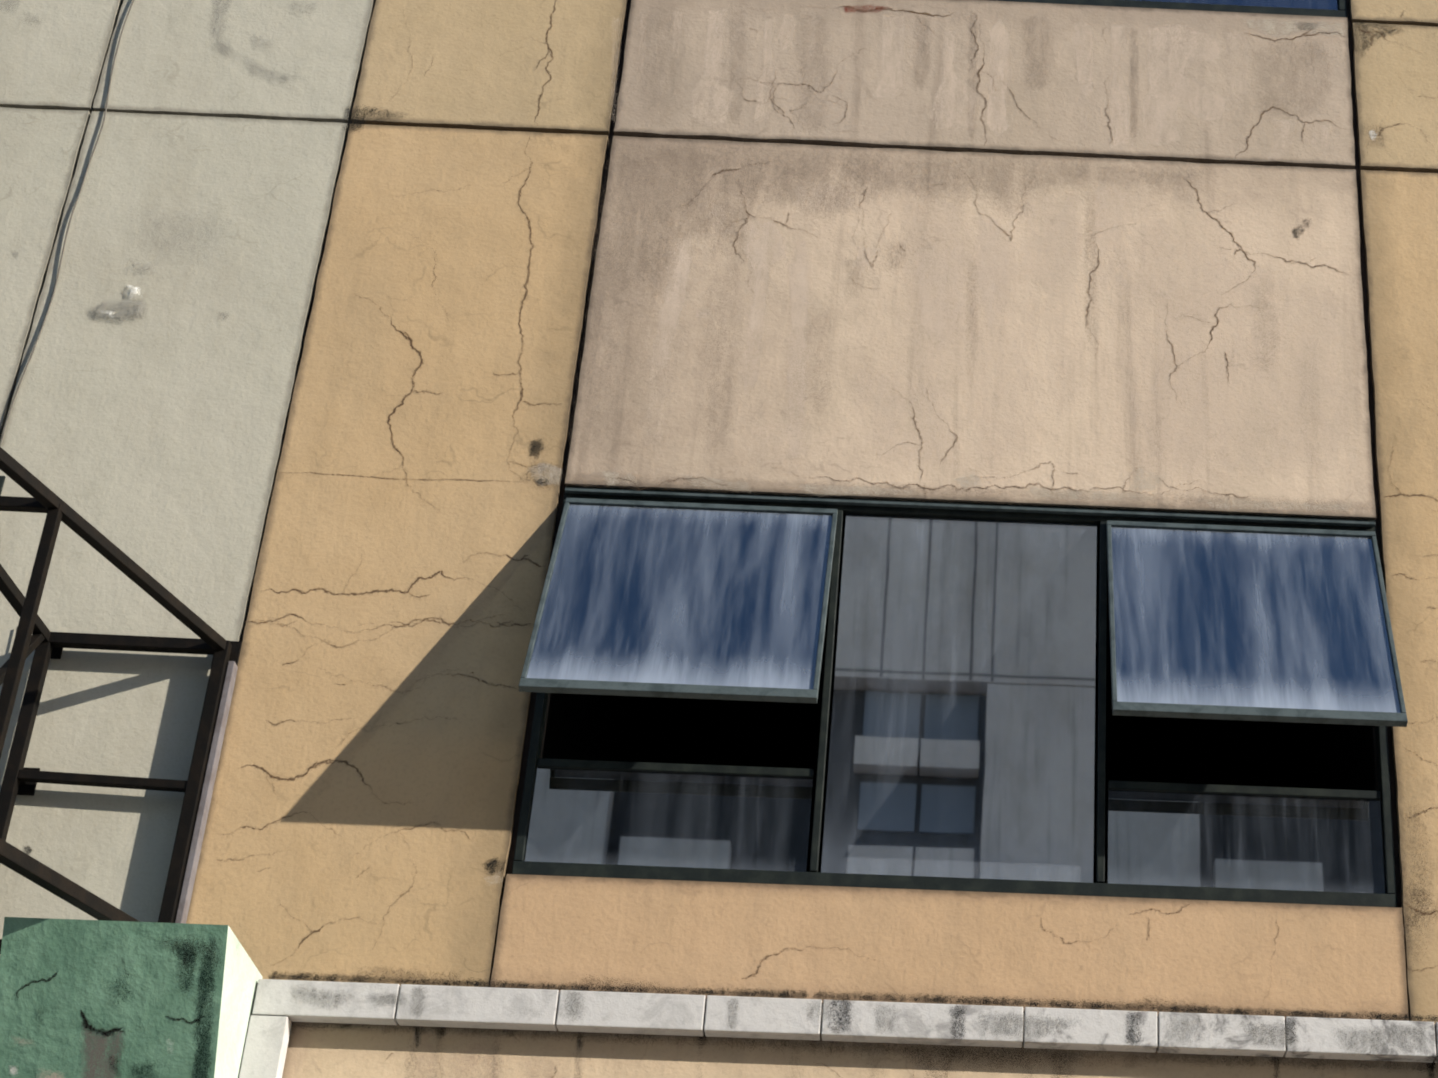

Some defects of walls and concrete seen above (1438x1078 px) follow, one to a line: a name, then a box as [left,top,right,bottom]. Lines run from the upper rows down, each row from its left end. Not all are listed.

crack [728,53,858,132]
crack [807,6,1040,240]
crack [281,2,564,511]
crack [678,161,810,292]
crack [842,166,906,290]
leakage [567,9,1336,473]
crack [1086,223,1136,356]
crack [1165,179,1344,400]
crack [784,388,1247,498]
crack [1385,447,1437,512]
crack [219,552,545,965]
leakage [267,965,1438,1078]